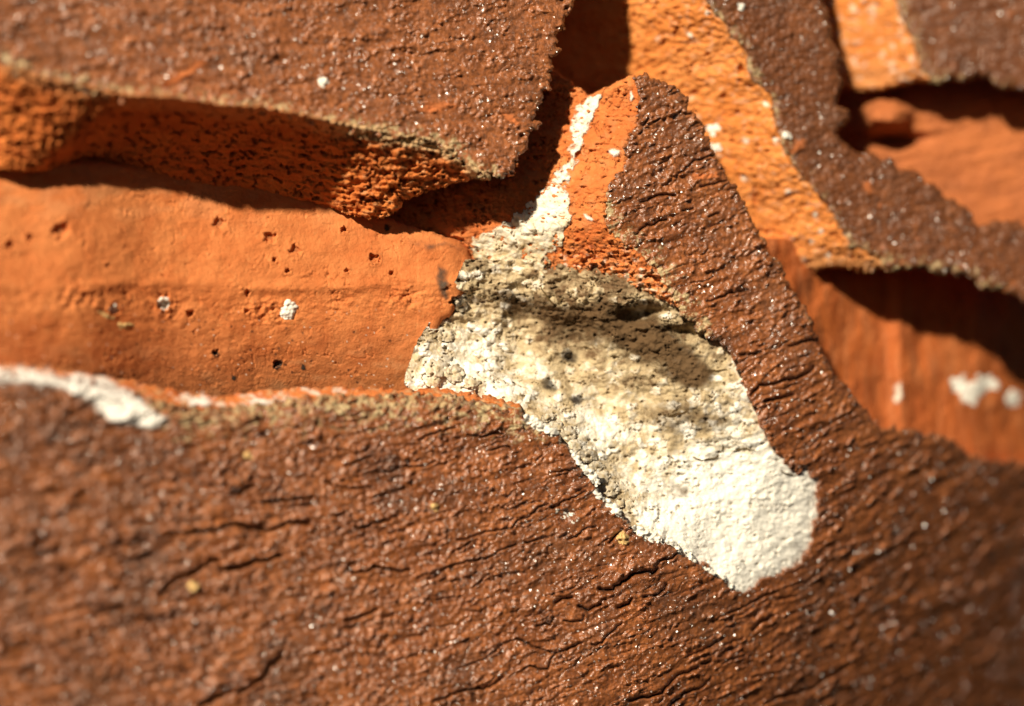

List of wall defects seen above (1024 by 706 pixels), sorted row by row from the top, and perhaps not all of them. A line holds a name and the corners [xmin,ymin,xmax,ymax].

spalling [550,0,1024,303]
spalling [0,69,680,397]
spalling [0,367,166,428]
spalling [81,372,521,410]
spalling [404,184,819,593]
crack [658,406,689,417]
spalling [764,238,1024,462]
crack [348,562,409,573]
crack [441,468,586,599]
crack [433,553,680,702]